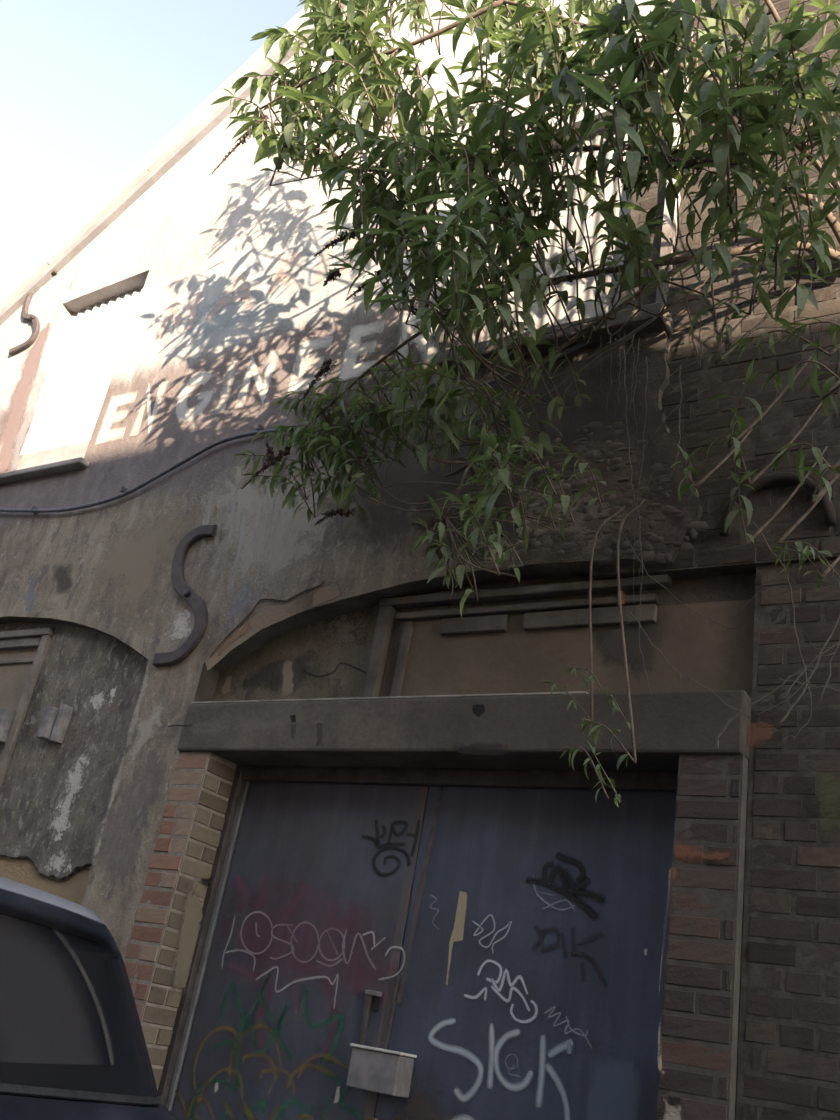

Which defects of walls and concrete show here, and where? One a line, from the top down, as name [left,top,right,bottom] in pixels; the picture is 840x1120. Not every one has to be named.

peeling [167,610,192,647]
peeling [84,686,117,710]
peeling [127,695,165,771]
flaking render [0,746,93,905]
flaking render [663,1097,682,1120]